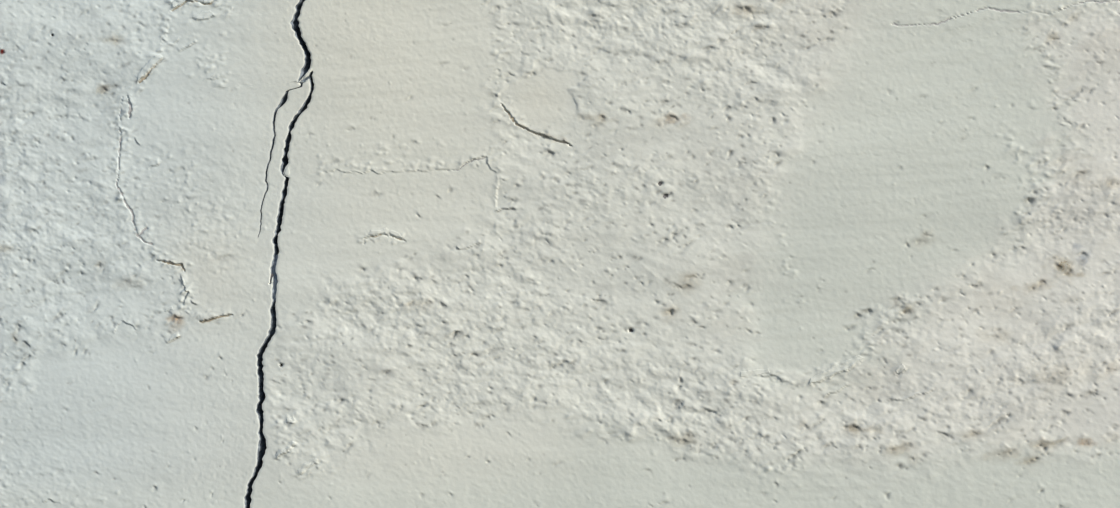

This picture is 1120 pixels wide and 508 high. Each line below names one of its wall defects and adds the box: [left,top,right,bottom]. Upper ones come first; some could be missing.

crack [244,0,314,508]